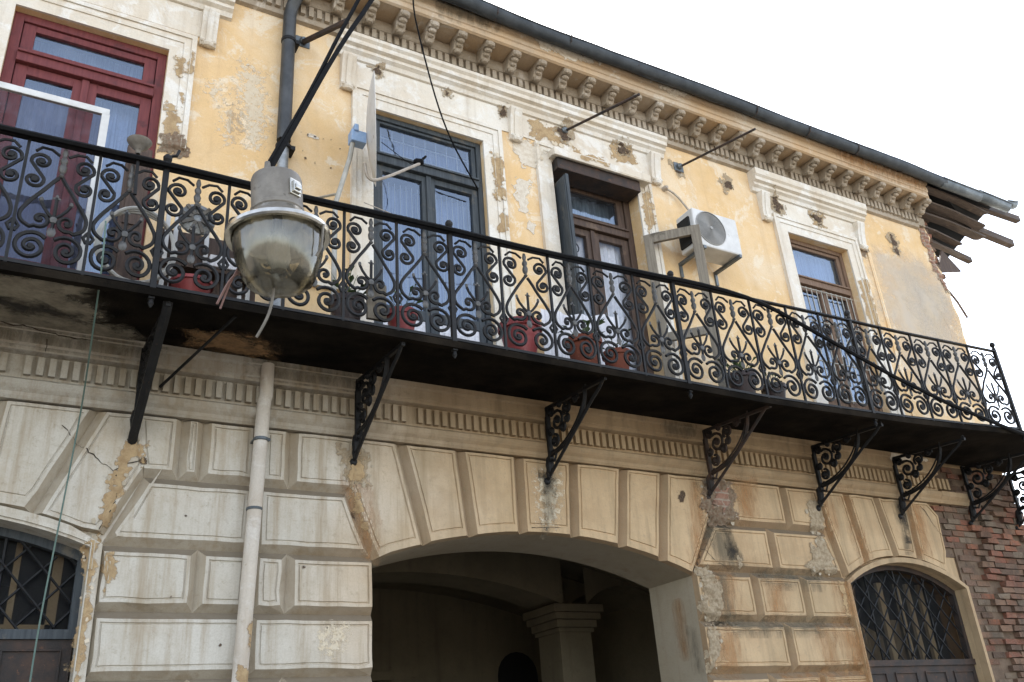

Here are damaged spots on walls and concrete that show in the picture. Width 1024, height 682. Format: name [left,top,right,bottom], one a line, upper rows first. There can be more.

peeling [175,51,196,78]
spalling [155,92,190,159]
peeling [489,117,638,234]
crack [62,425,141,529]
flaking render [64,441,149,682]
spalling [336,442,374,498]
spalling [700,476,740,528]
damp [710,524,741,561]
flaking render [804,499,838,576]
flaking render [930,467,1024,682]
spalling [693,565,724,674]